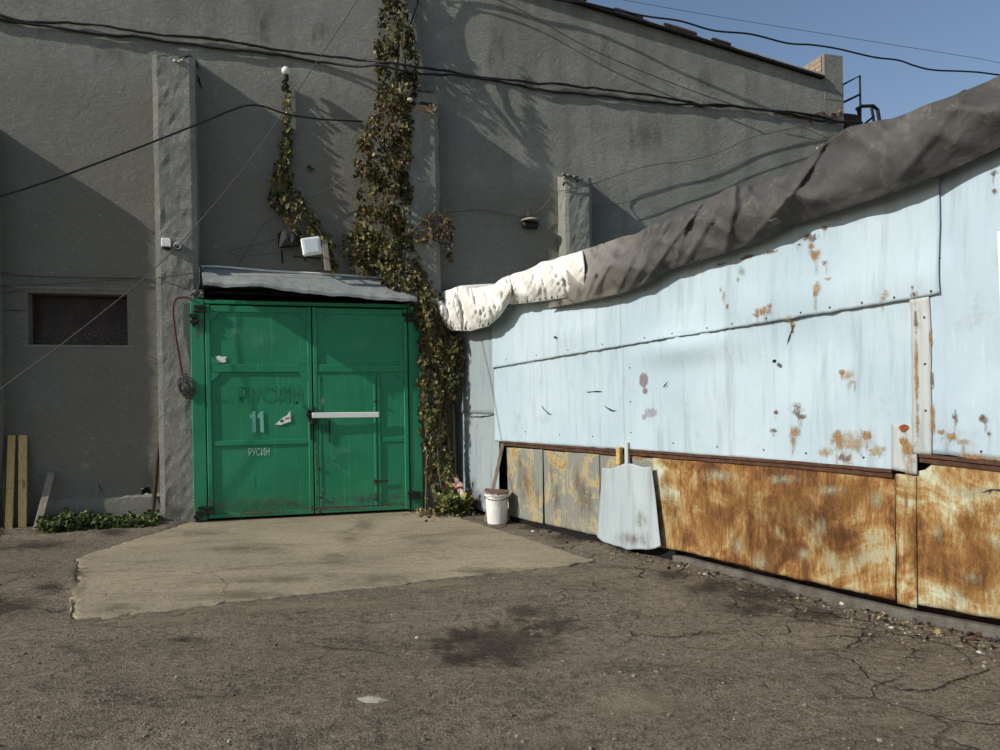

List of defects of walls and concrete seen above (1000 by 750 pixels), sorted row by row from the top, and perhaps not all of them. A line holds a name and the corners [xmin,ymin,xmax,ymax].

corrosion [797,226,827,265]
corrosion [899,341,919,462]
corrosion [790,403,806,443]
corrosion [821,431,884,462]
corrosion [930,406,1000,461]